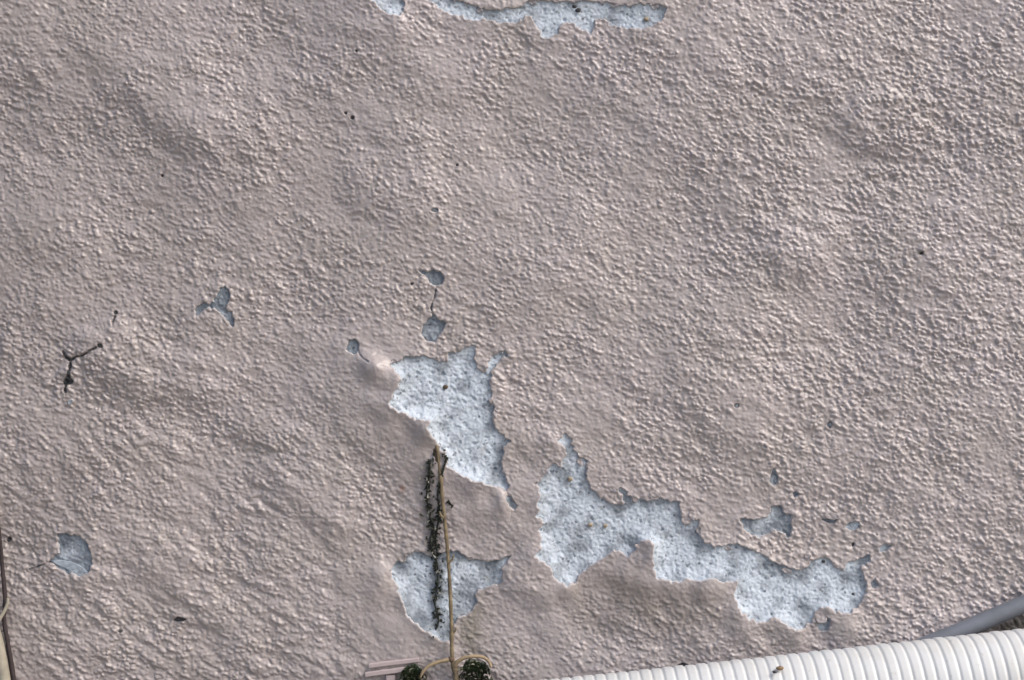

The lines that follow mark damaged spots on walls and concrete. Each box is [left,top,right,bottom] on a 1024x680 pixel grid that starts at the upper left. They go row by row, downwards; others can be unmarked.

peeling [303,0,686,84]
peeling [178,268,252,346]
crack [63,344,102,405]
peeling [321,252,895,680]
peeling [29,515,111,595]